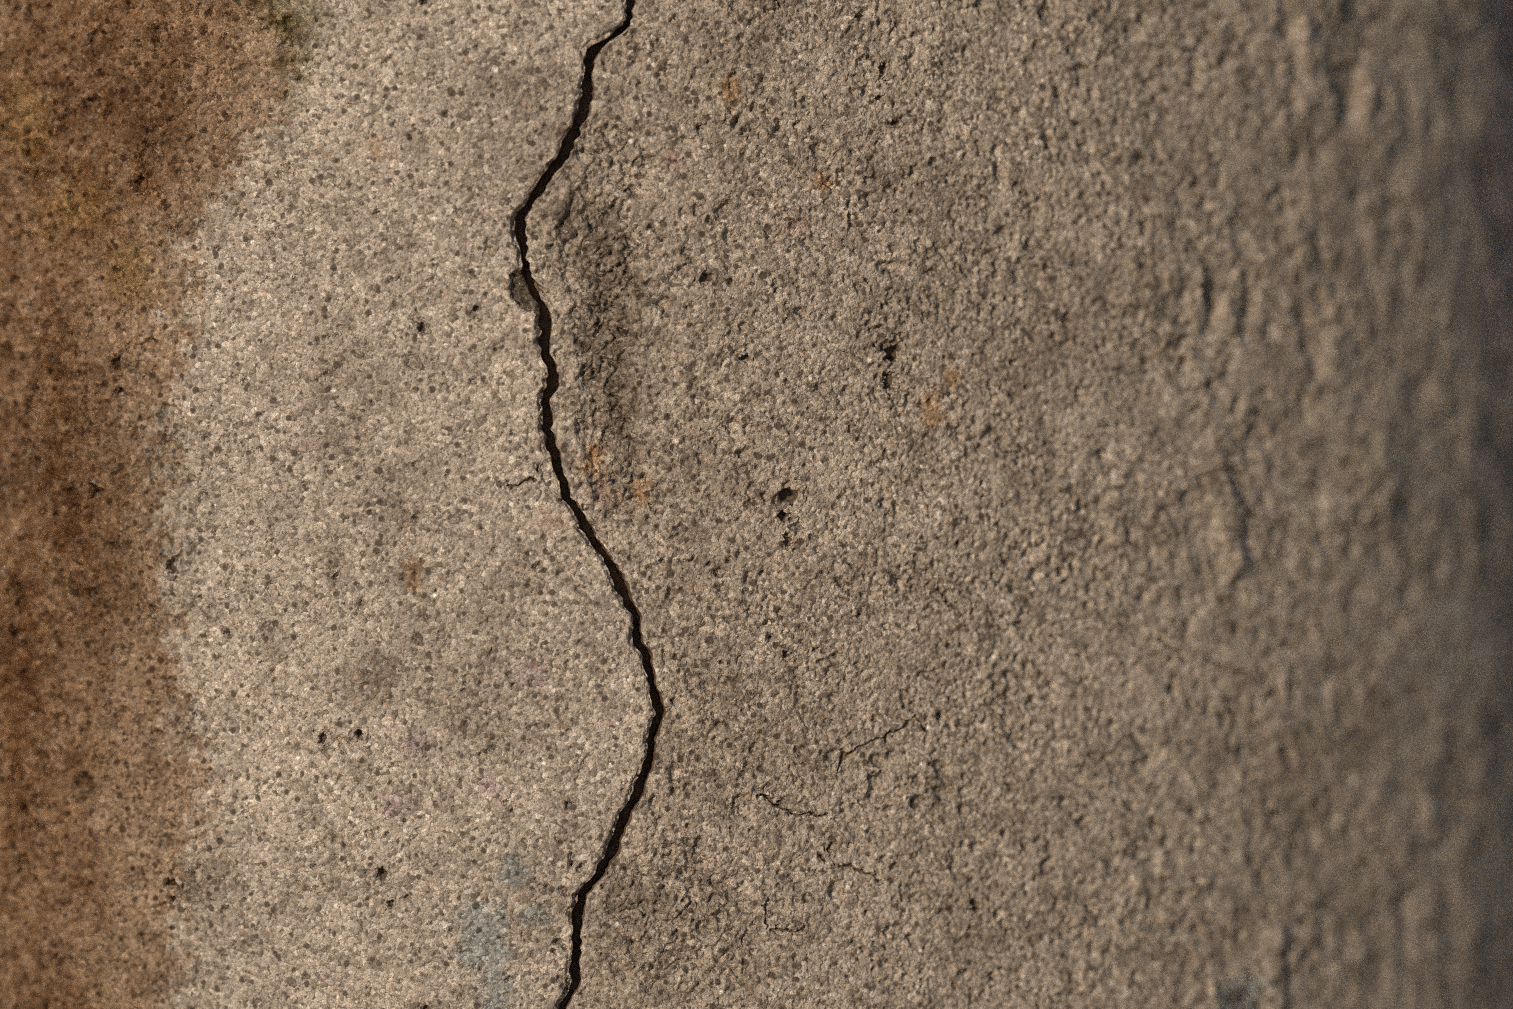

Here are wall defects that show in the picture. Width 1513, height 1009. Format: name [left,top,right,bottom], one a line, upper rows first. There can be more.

crack [505,0,673,1009]